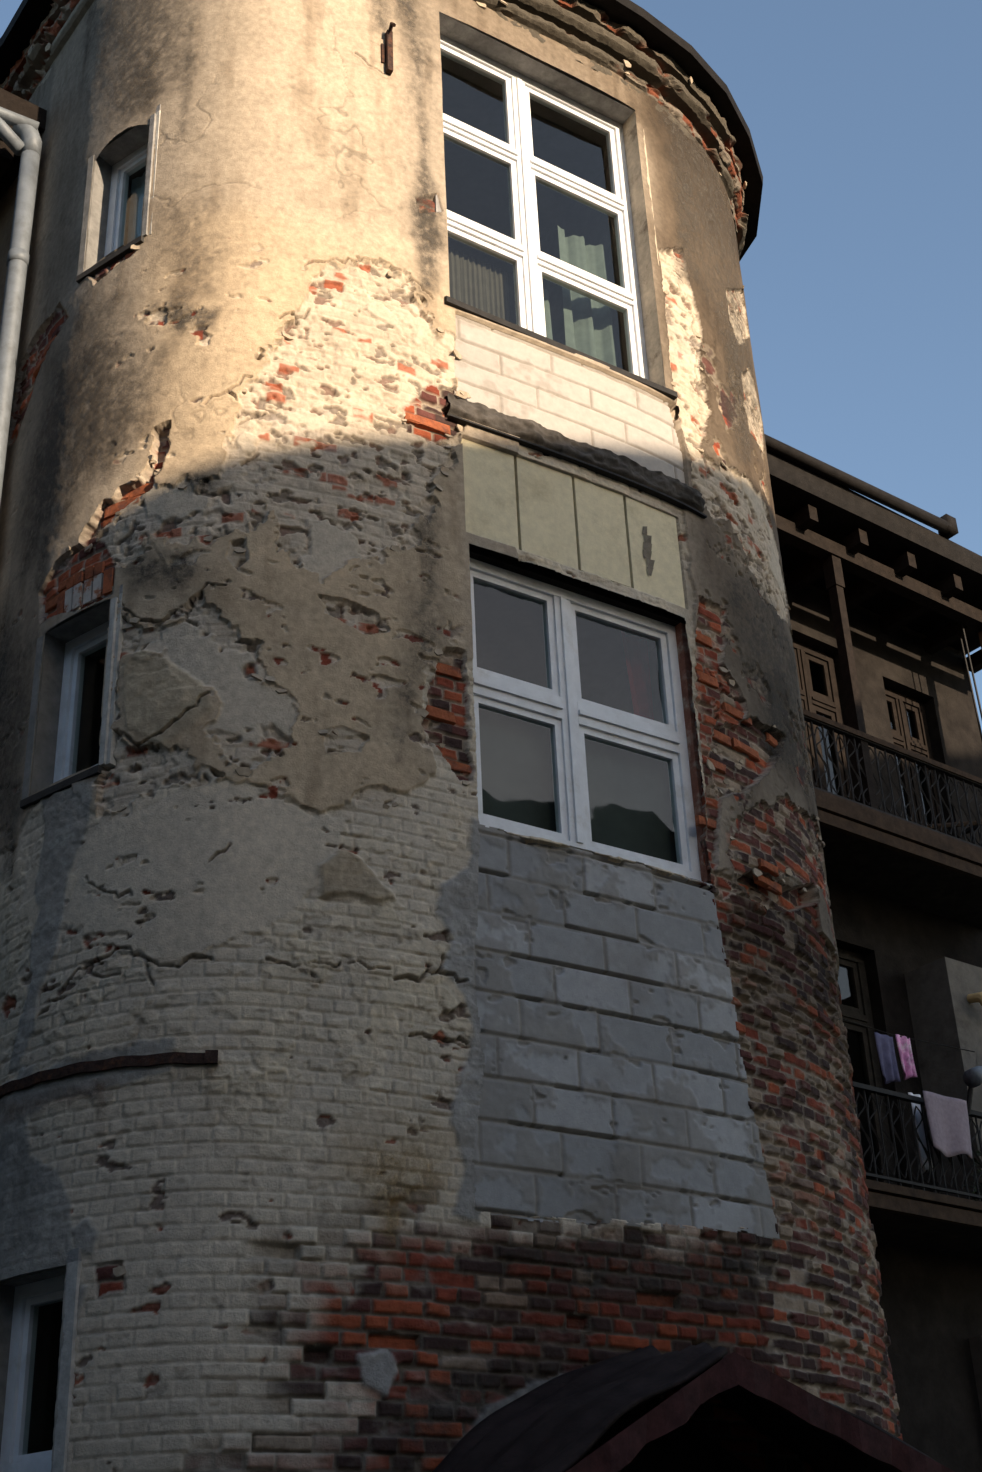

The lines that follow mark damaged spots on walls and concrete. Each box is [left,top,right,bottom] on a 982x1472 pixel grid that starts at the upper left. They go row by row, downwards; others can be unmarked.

spalling [7,301,69,448]
water stain [23,314,147,590]
spalling [87,244,140,286]
water stain [167,295,217,329]
water stain [419,160,437,286]
flaking render [657,246,792,635]
flaking render [38,255,476,819]
spalling [693,595,827,913]
spalling [93,1258,127,1300]